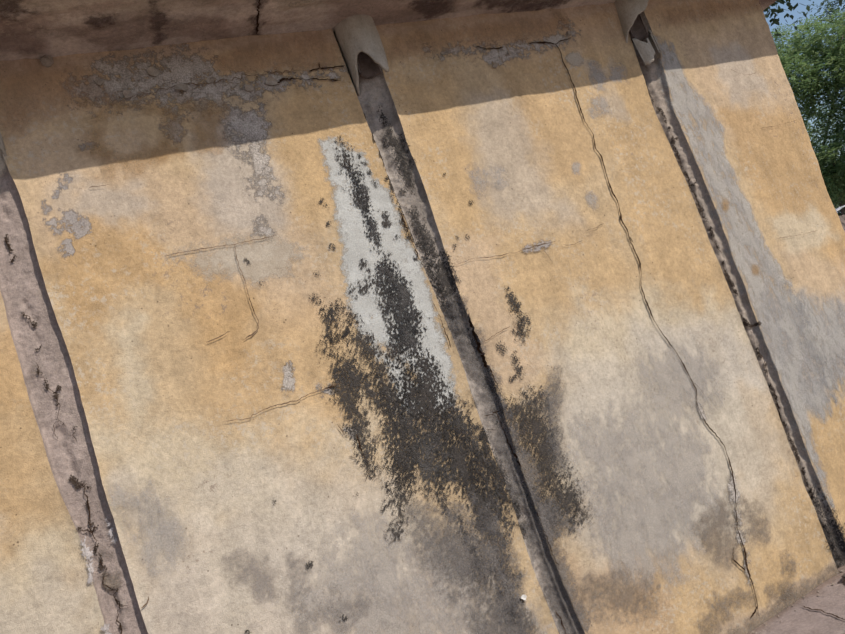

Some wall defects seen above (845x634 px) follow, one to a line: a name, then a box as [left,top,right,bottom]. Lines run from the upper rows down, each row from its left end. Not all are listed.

damp [476,0,566,13]
peeling [61,44,348,204]
crack [4,234,17,263]
crack [21,312,77,441]
peeling [41,173,92,257]
peeling [169,215,303,283]
peeling [319,137,456,417]
damp [300,107,737,634]
crack [453,35,762,634]
damp [654,36,845,634]
crack [755,347,814,500]
crack [68,474,149,634]